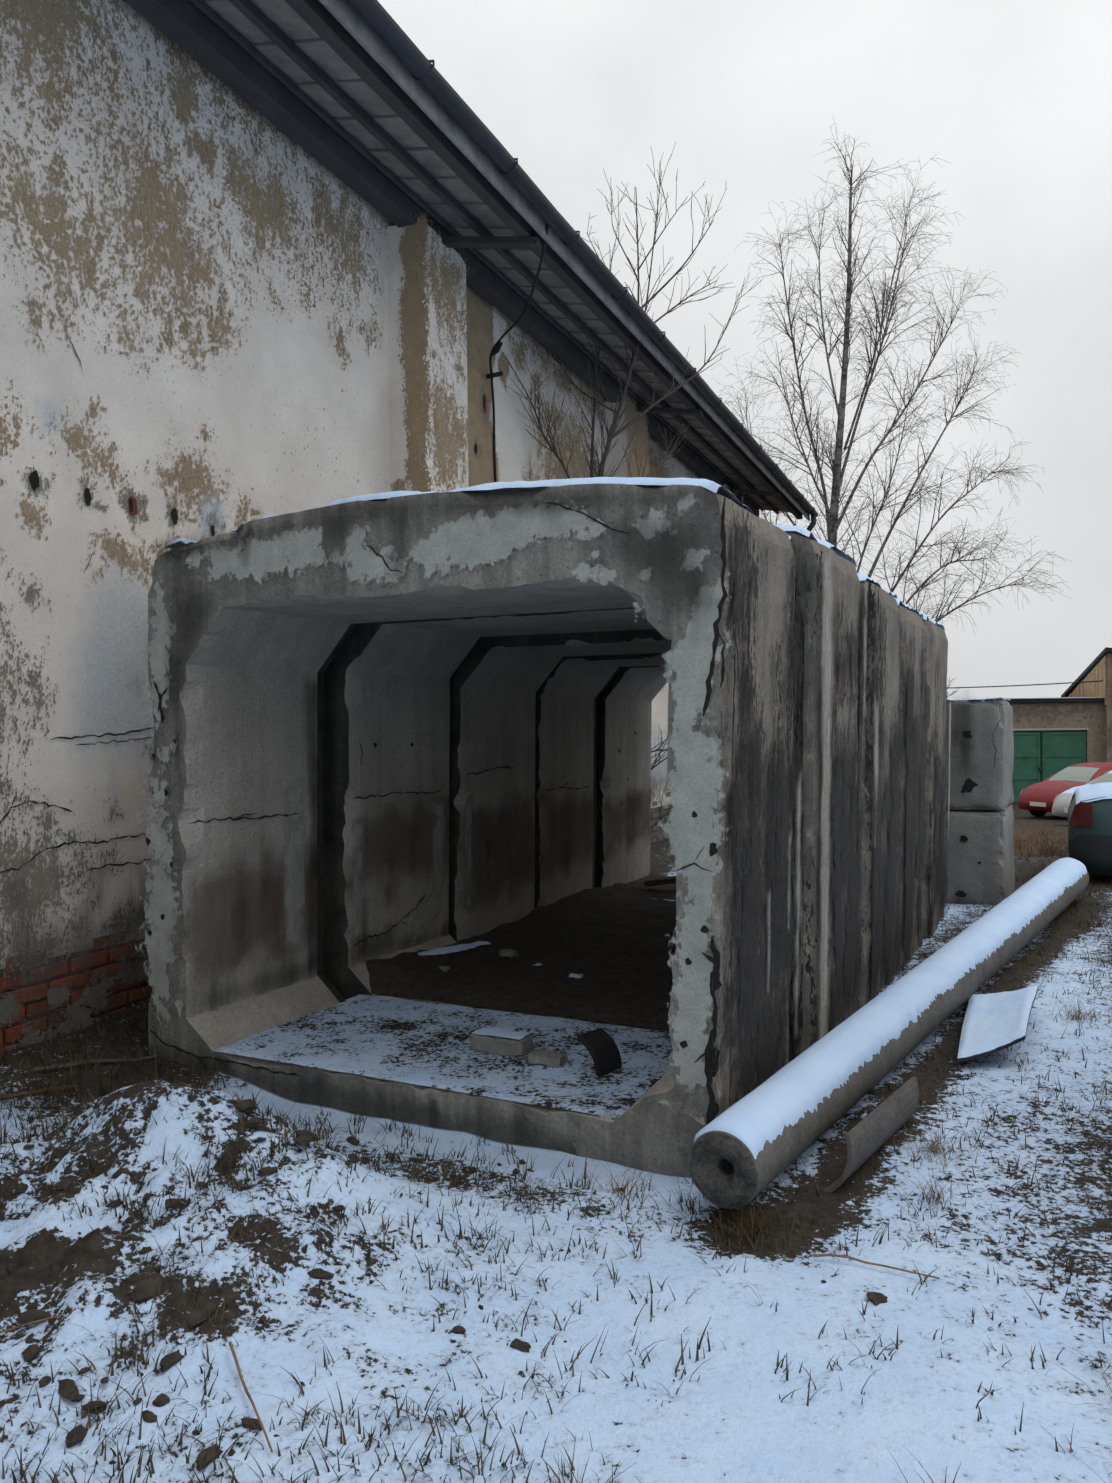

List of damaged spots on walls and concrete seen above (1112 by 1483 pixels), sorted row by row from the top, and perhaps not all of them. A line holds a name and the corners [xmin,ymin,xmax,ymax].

peeling [0,0,617,1053]
crack [0,796,152,888]
crack [188,812,302,824]
damp [285,781,304,945]
crack [674,496,740,1125]
damp [789,783,800,951]
spalling [625,394,978,1125]
damp [819,560,831,1040]
damp [864,694,878,777]